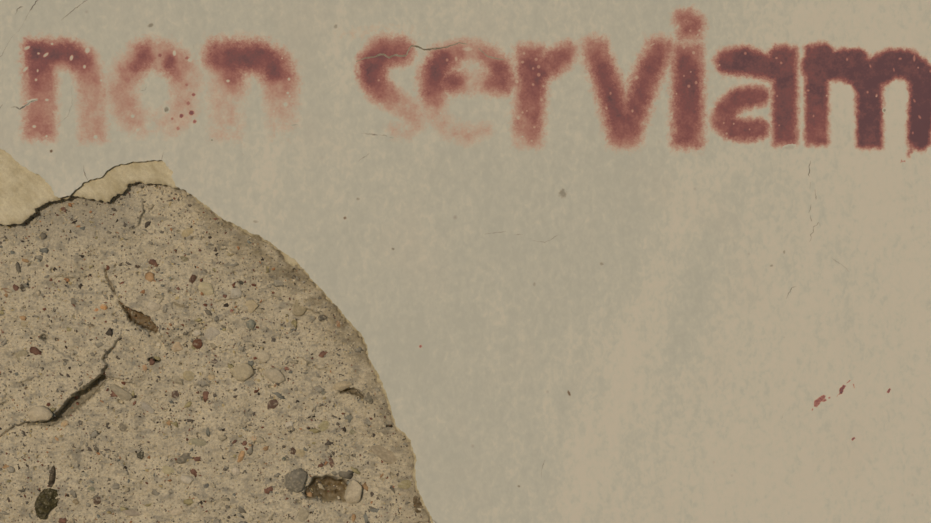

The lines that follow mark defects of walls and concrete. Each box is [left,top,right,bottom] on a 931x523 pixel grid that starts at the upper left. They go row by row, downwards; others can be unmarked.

crack [356,42,504,62]
crack [105,269,158,333]
spalling [0,149,431,523]
crack [0,374,107,437]